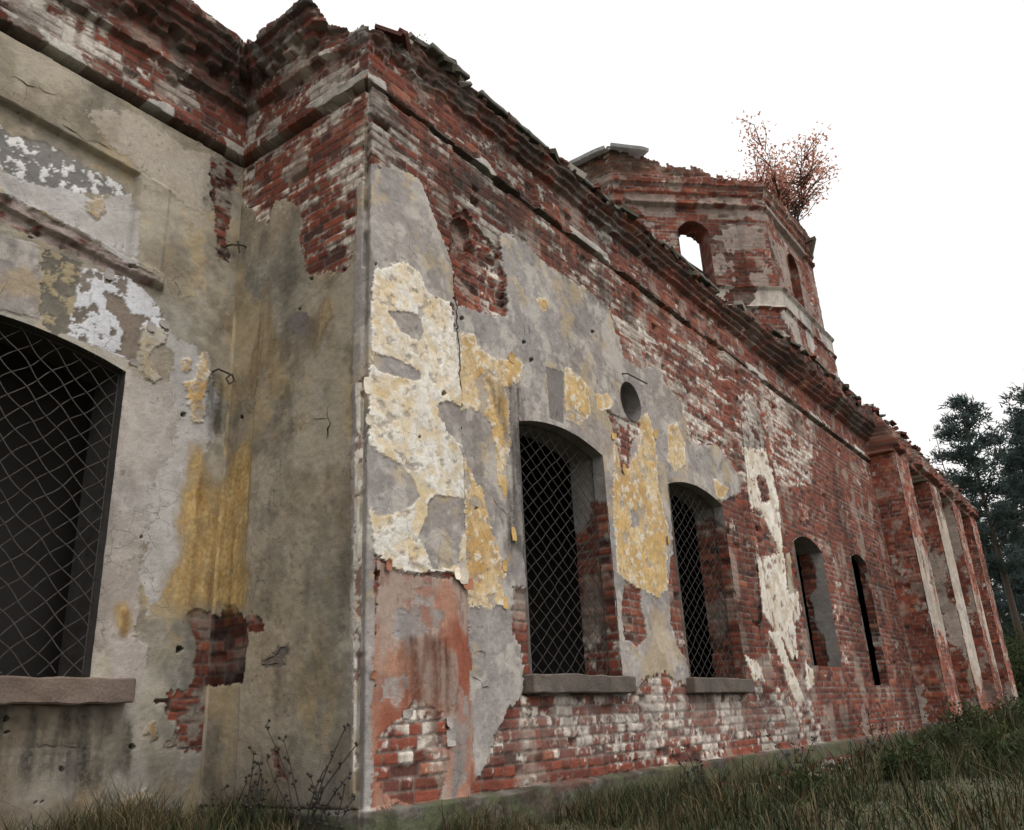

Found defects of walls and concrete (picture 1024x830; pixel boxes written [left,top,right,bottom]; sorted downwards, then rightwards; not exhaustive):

peeling [0,125,128,220]
peeling [0,193,222,615]
spalling [208,86,821,809]
spalling [144,605,264,753]
leakage [410,638,421,702]
leakage [432,639,450,695]